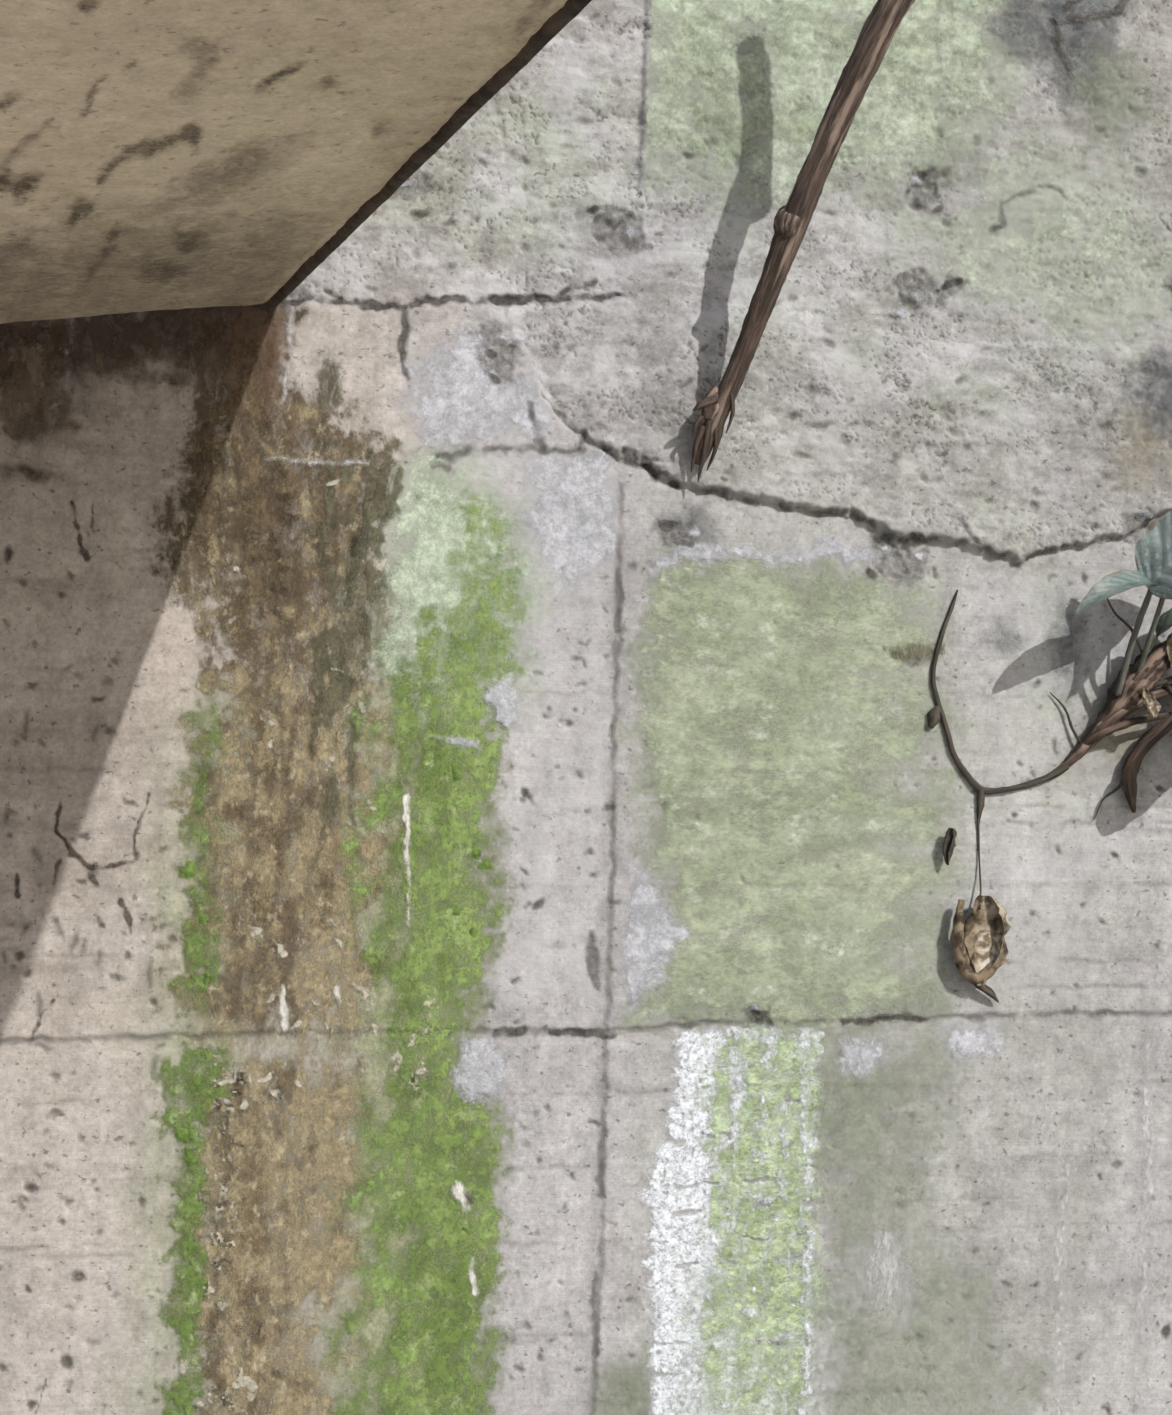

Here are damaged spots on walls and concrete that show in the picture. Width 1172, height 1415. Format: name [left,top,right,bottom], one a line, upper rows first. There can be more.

crack [278,280,621,375]
crack [433,405,932,564]
crack [963,523,1050,568]
damp [883,642,944,665]
damp [0,221,419,1415]
damp [387,998,435,1090]
efflorescence [640,1026,825,1415]
damp [469,1259,477,1295]